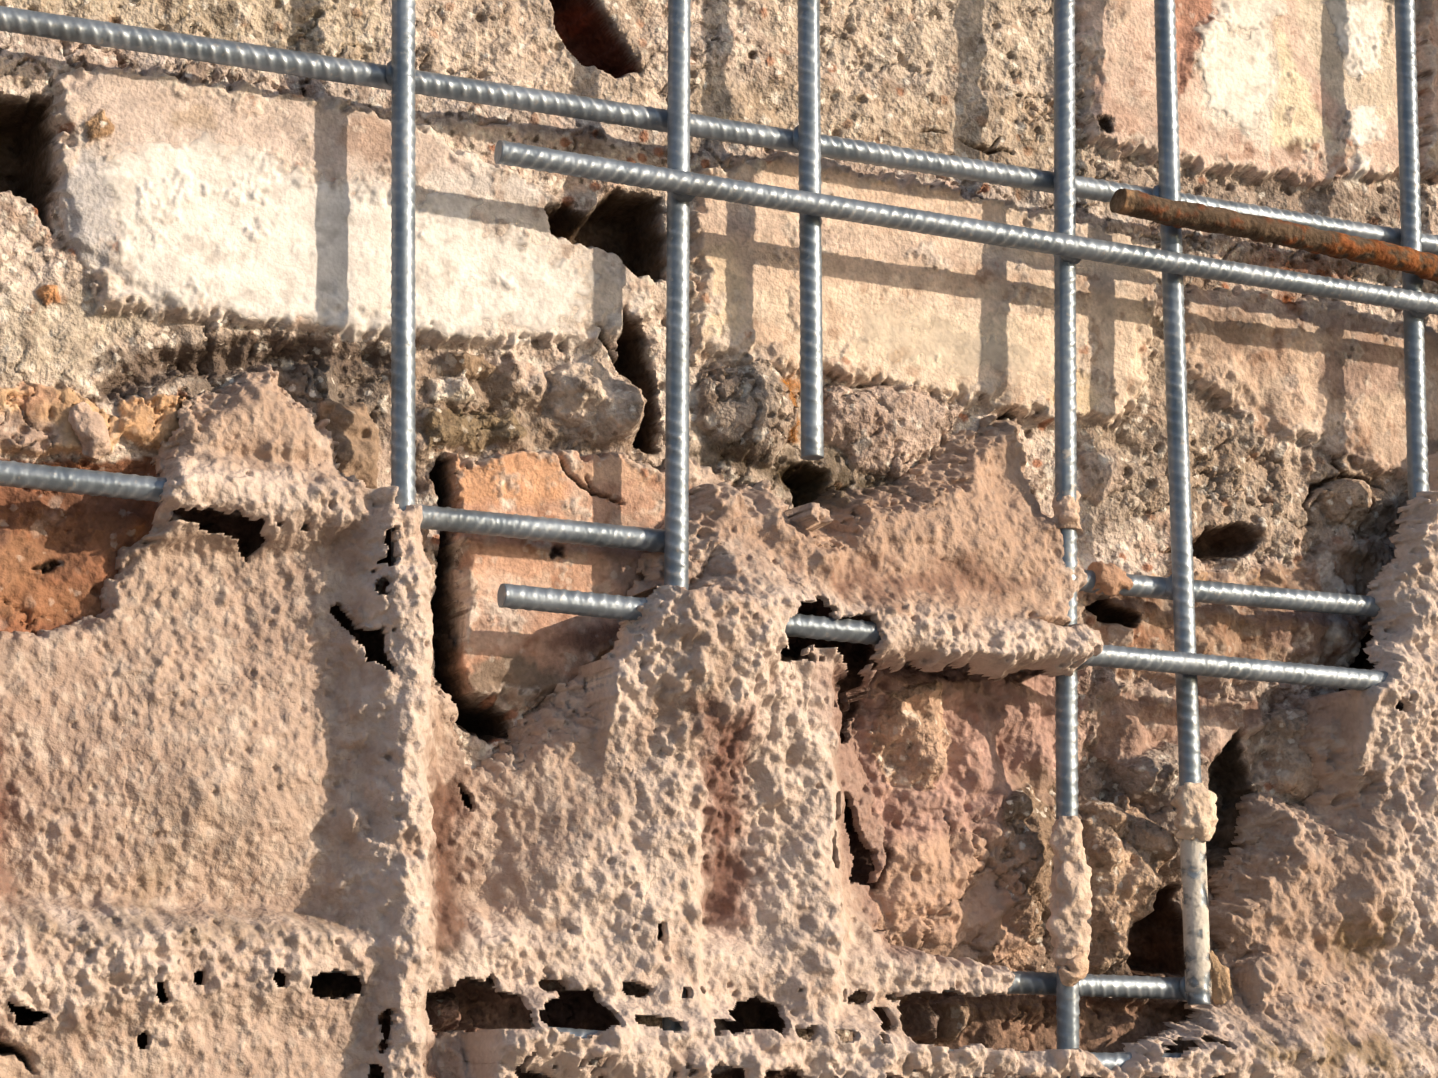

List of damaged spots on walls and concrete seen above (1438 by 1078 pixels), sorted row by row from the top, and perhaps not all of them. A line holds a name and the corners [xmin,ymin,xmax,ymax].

peeling [1175,0,1287,134]
peeling [1327,0,1384,76]
peeling [1348,105,1386,190]
peeling [96,135,392,407]
peeling [415,192,599,337]
corrosion [1290,260,1343,279]
spalling [0,453,160,477]
crack [1302,466,1376,526]
spalling [0,486,162,635]